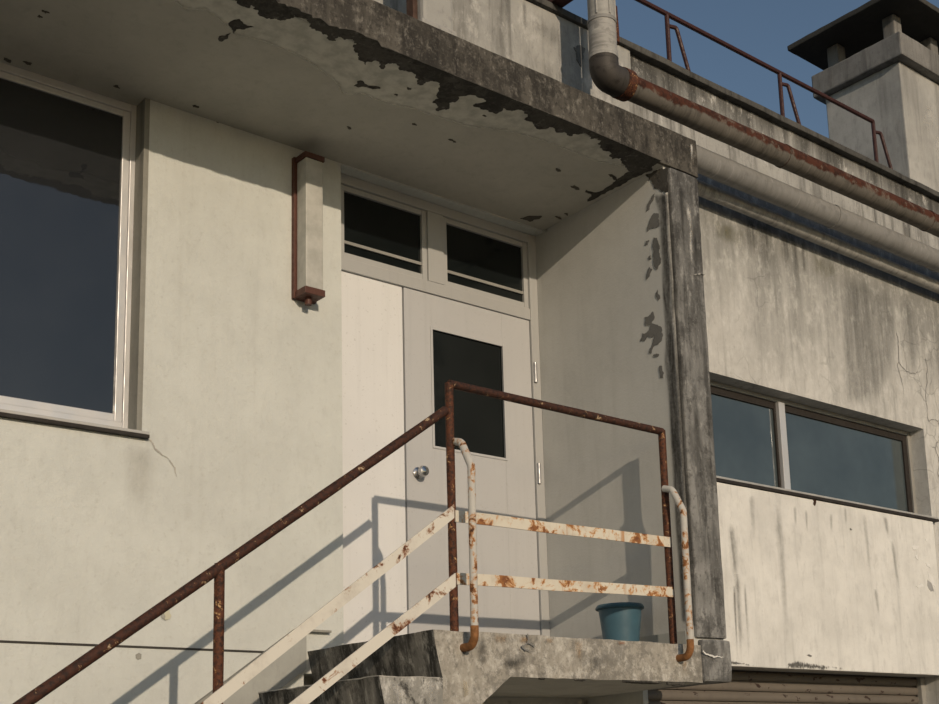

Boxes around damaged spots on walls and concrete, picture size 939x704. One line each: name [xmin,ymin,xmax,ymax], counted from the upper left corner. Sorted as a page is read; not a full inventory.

peeling [218,19,253,42]
peeling [235,0,669,280]
peeling [640,312,664,378]
crack [896,333,939,476]
crack [148,438,177,476]